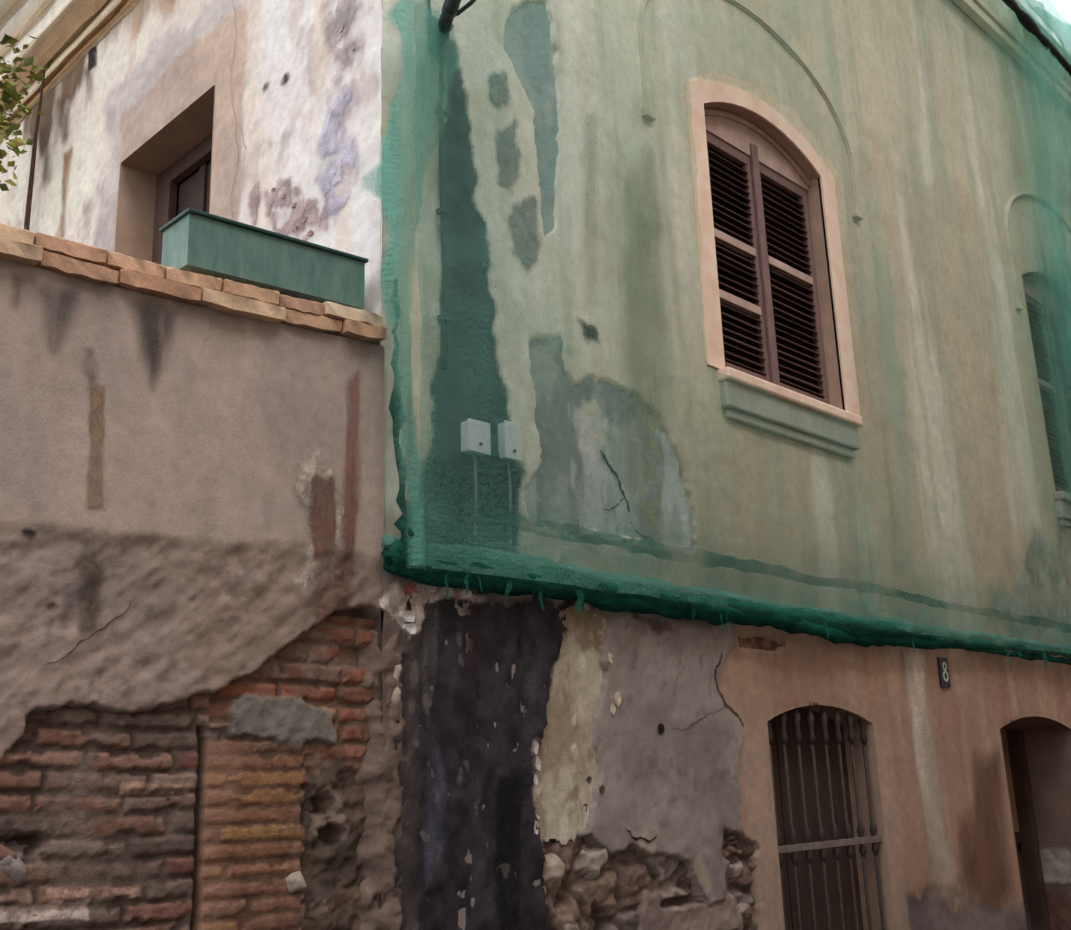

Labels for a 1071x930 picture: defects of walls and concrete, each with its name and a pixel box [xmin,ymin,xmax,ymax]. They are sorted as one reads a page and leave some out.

peeling [248,0,363,241]
peeling [524,336,694,552]
spalling [0,448,484,930]
damp [393,607,445,884]
damp [497,776,521,930]
spalling [532,603,759,930]
crack [672,652,744,730]
peeling [738,636,785,651]